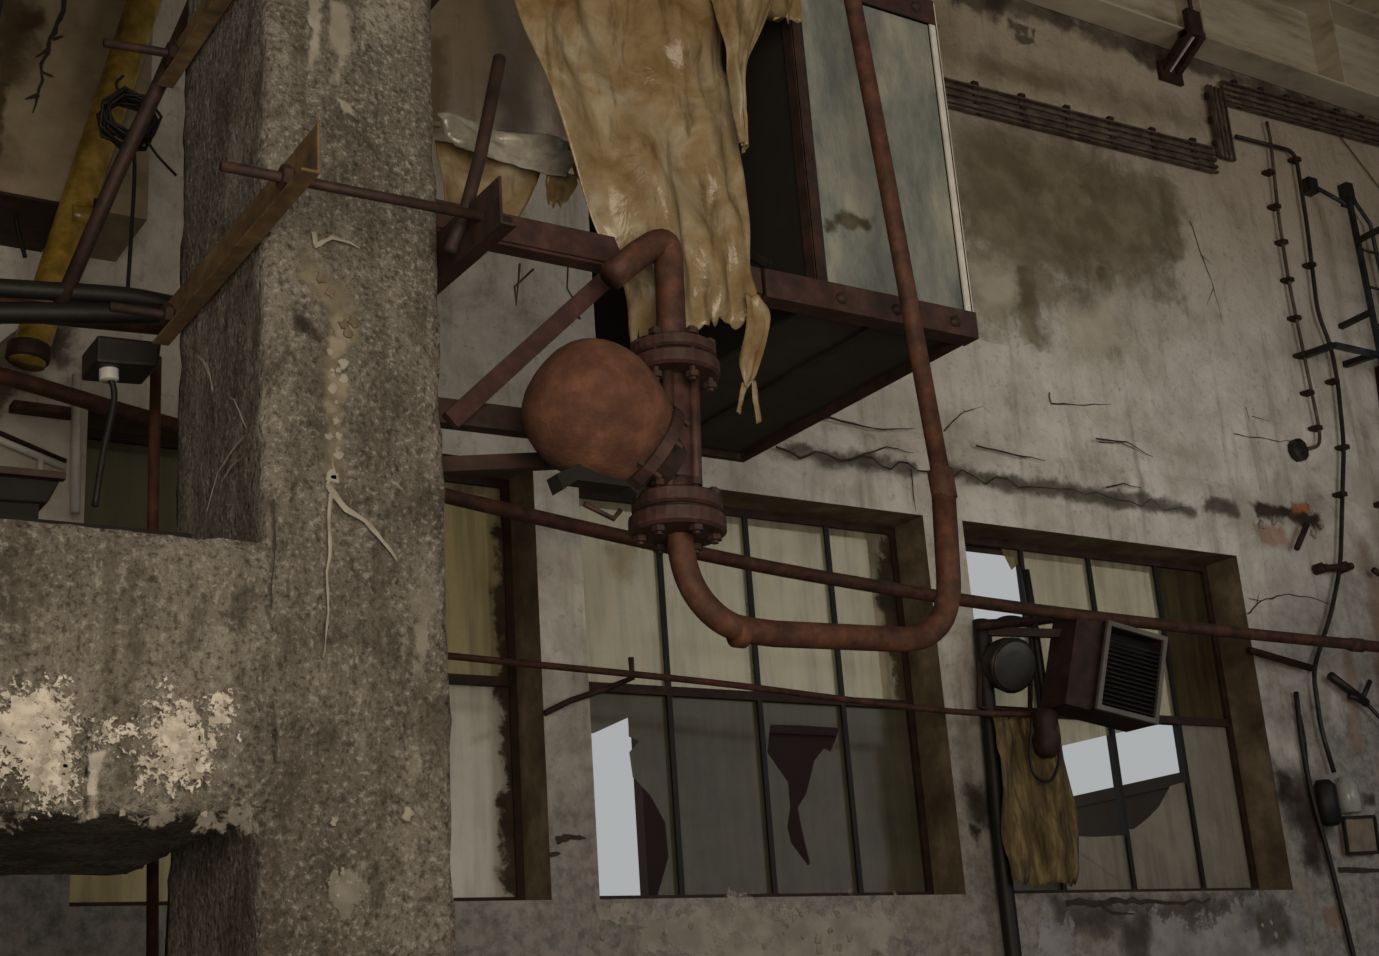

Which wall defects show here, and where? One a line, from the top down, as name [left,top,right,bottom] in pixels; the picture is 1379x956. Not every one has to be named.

crack [25,0,67,113]
damp [955,120,1182,360]
crack [1049,392,1110,406]
crack [776,406,1240,518]
peeling [0,669,242,821]